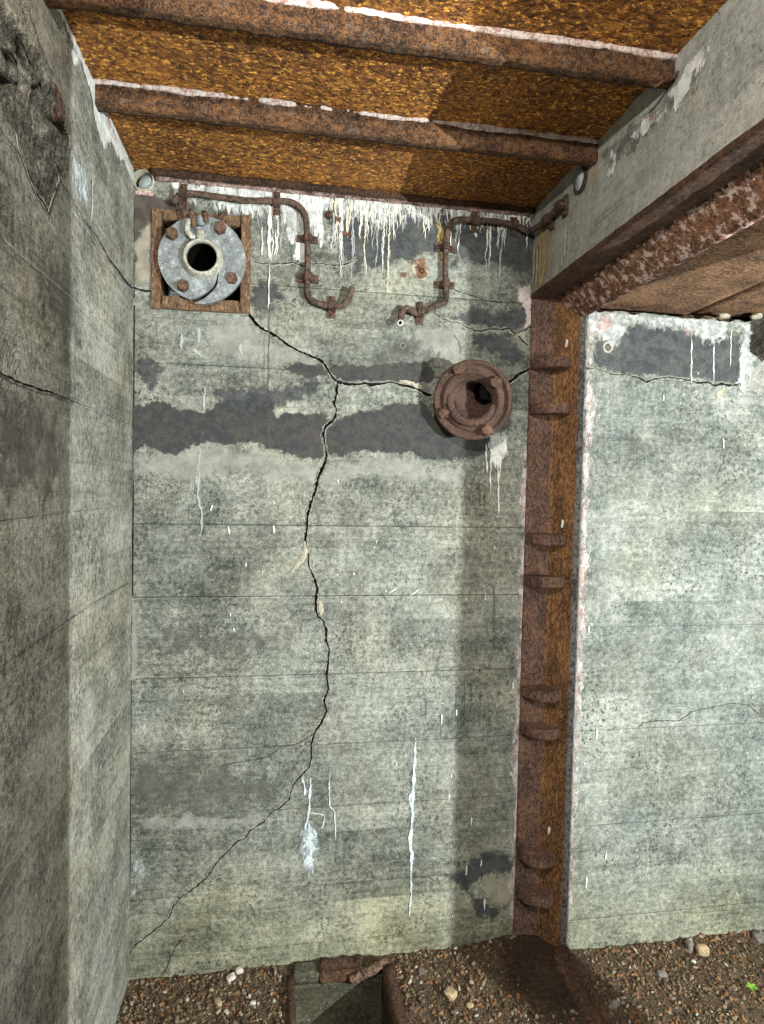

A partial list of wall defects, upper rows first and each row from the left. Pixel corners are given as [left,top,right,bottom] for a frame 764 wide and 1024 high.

spalling [0,0,72,206]
crack [0,371,127,425]
leakage [132,176,534,536]
crack [433,312,531,384]
crack [586,368,737,387]
crack [129,314,432,975]
leakage [445,446,527,922]
leakage [568,312,743,923]
leakage [300,778,336,875]
leakage [396,738,417,916]